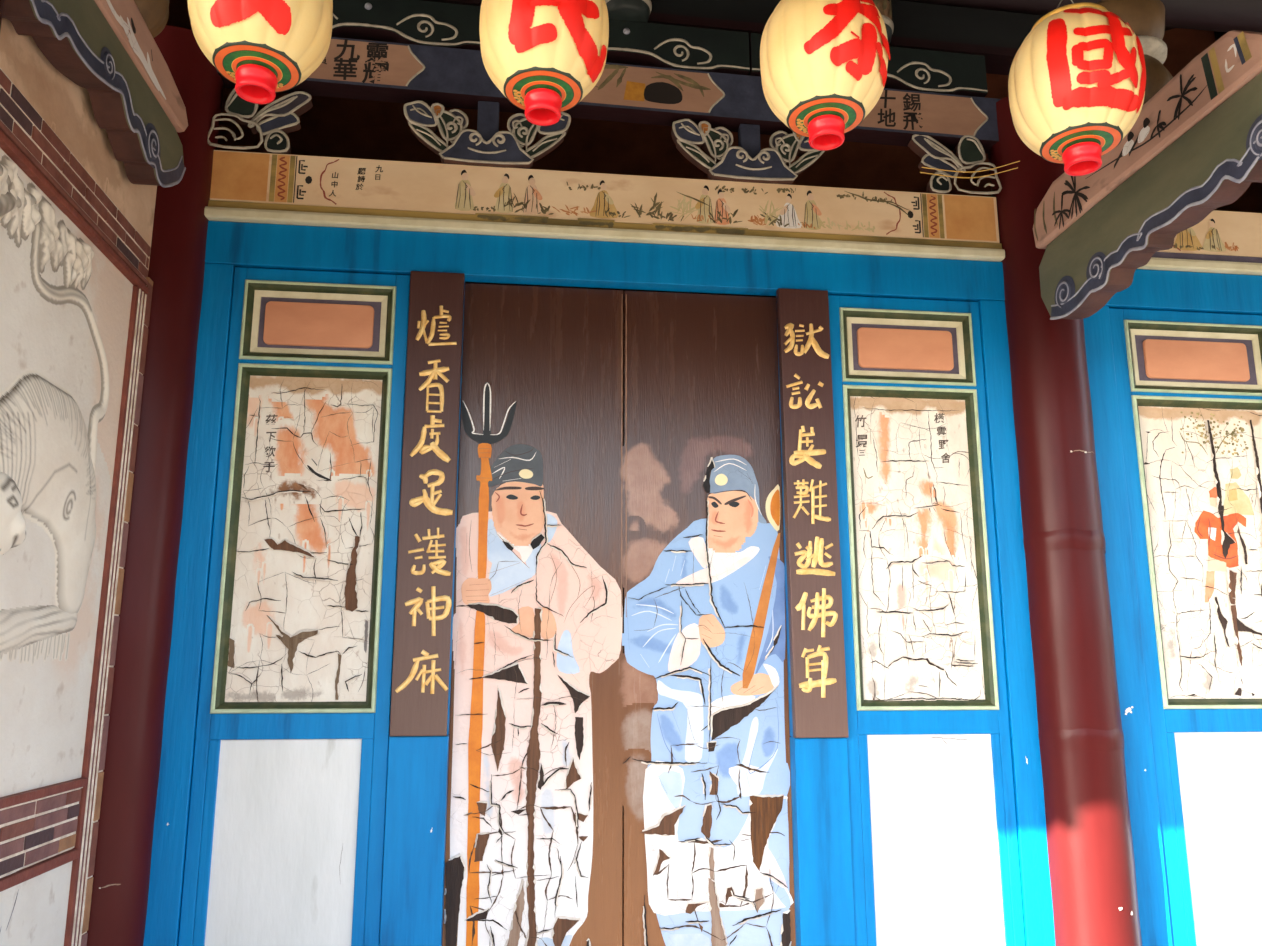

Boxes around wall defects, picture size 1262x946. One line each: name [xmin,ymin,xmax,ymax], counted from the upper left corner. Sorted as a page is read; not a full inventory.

peeling [237,500,368,700]
crack [229,381,378,703]
crack [854,397,986,701]
crack [1144,407,1262,699]
peeling [1207,420,1262,696]